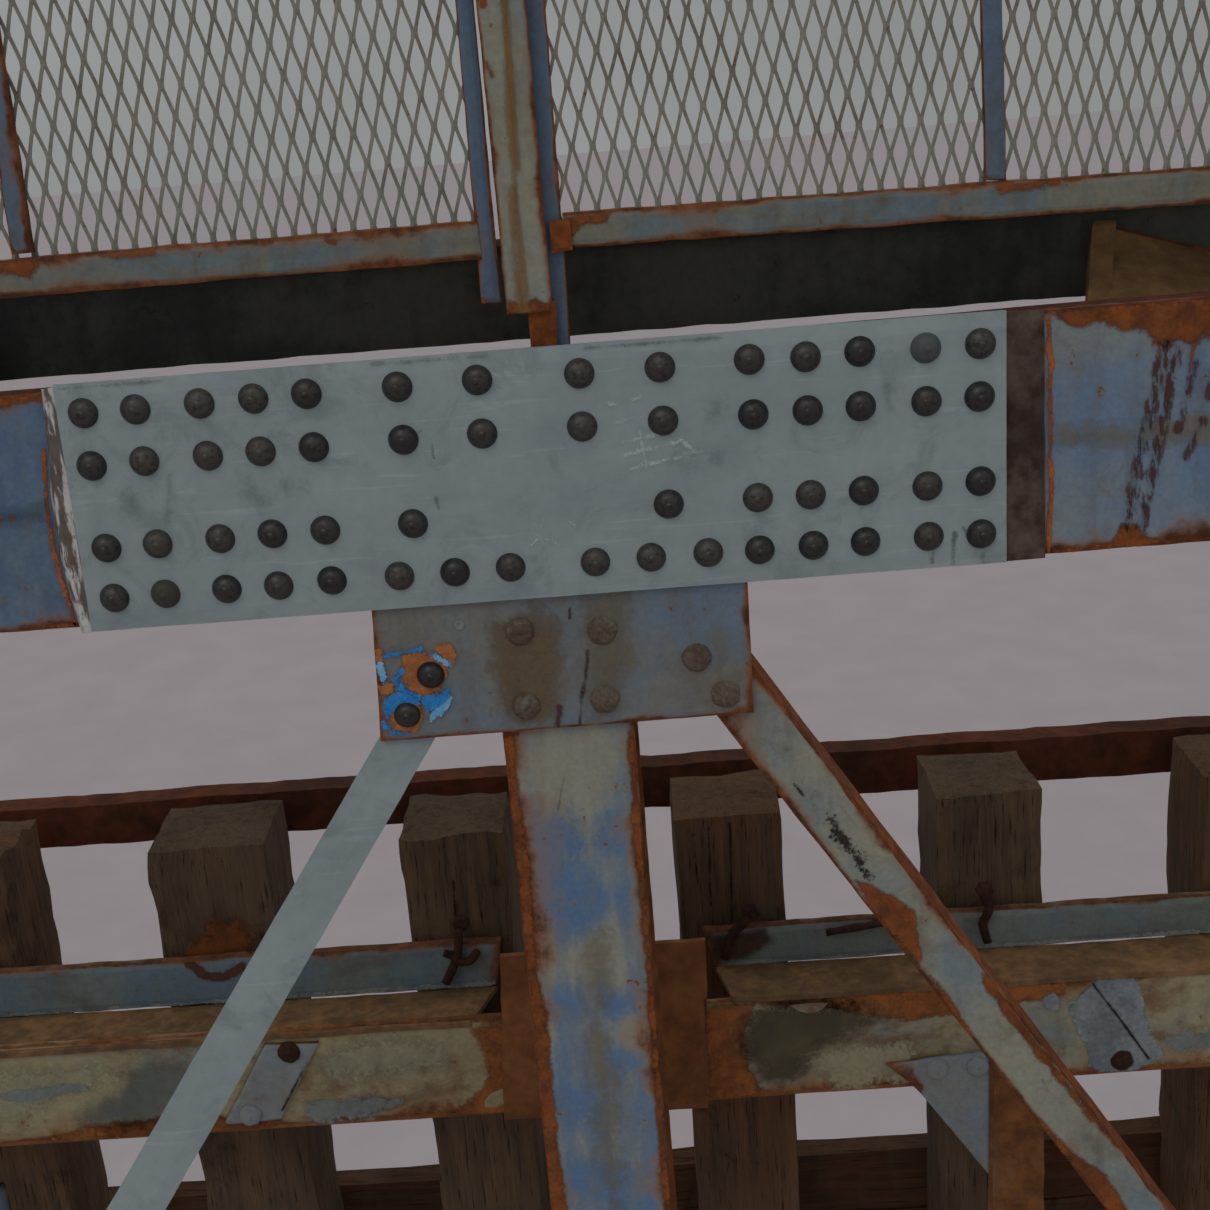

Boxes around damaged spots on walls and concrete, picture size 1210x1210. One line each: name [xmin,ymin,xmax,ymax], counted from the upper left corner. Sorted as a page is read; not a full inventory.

rust [484,0,550,313]
rust [1046,299,1210,553]
peeling [374,643,457,737]
rust [504,736,567,1210]
rust [627,732,670,1210]
rust [710,929,771,961]
rust [753,982,971,1035]
rust [823,813,922,961]
rust [982,972,1098,1122]
rust [46,1117,159,1142]
rust [210,1116,276,1132]
rust [1035,1114,1127,1210]